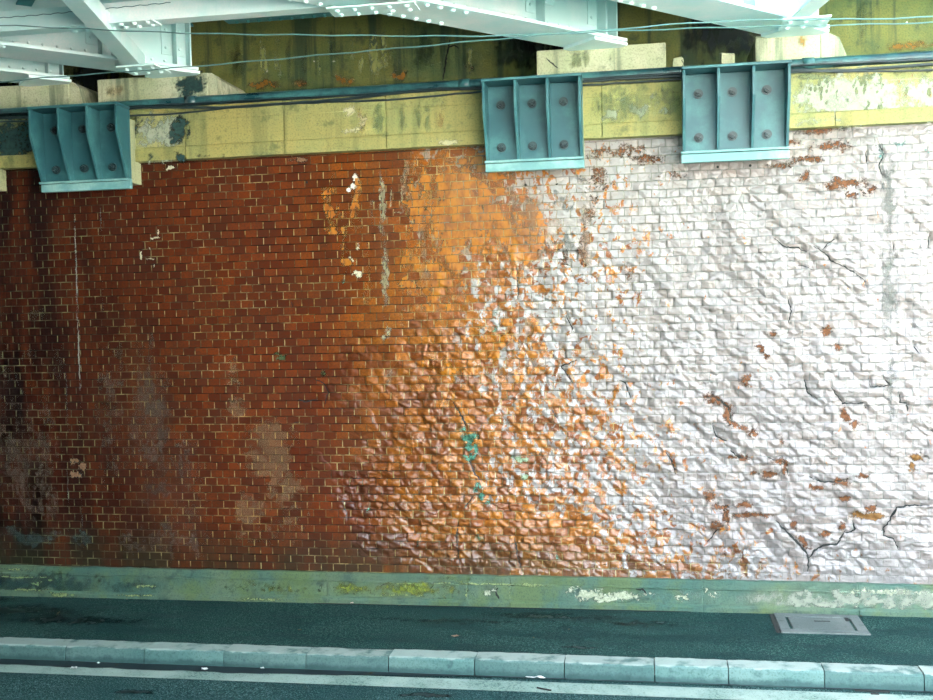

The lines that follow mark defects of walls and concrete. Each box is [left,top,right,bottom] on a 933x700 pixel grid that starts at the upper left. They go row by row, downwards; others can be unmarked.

spalling [580,144,661,223]
spalling [544,237,587,272]
damp [236,420,305,524]
crack [776,520,856,572]
crack [882,504,930,548]